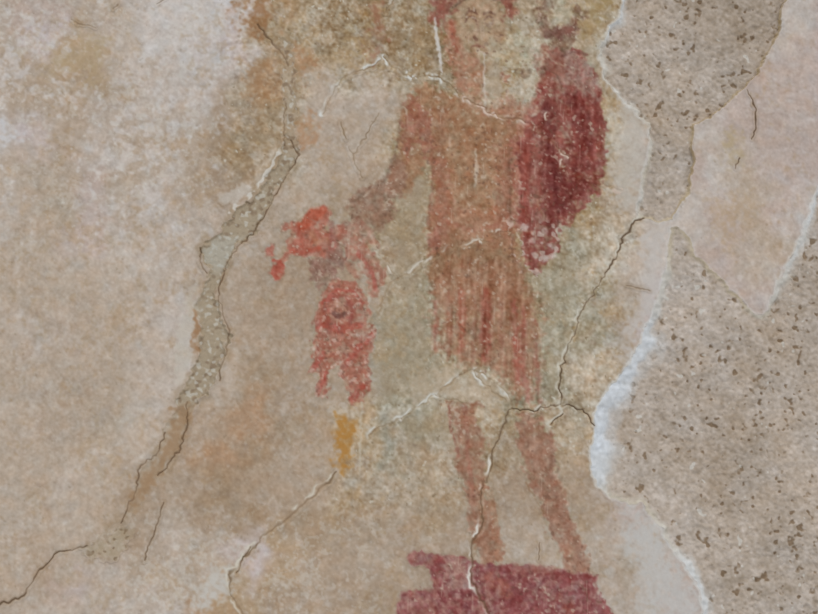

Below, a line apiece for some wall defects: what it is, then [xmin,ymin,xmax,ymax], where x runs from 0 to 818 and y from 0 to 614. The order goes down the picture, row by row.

crack [0,21,653,614]
spalling [588,0,818,614]